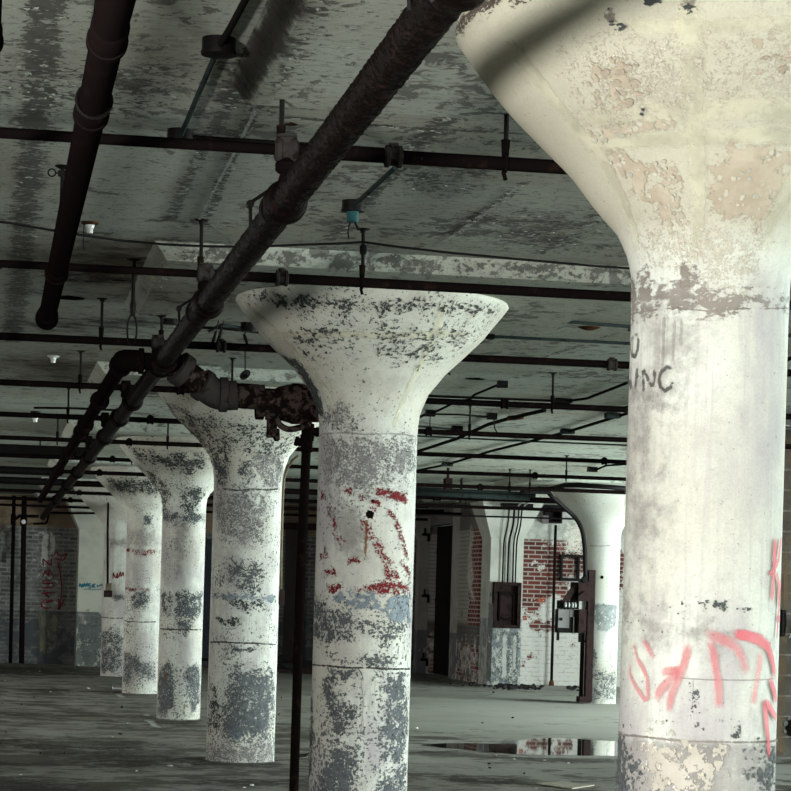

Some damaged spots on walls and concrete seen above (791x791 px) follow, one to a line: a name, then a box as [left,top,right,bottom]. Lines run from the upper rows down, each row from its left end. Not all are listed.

peeling [583,50,691,229]
peeling [702,137,791,235]
peeling [241,288,506,560]
peeling [104,397,292,639]
peeling [308,587,412,791]
peeling [486,601,527,685]
peeling [615,720,741,791]
peeling [742,737,777,791]